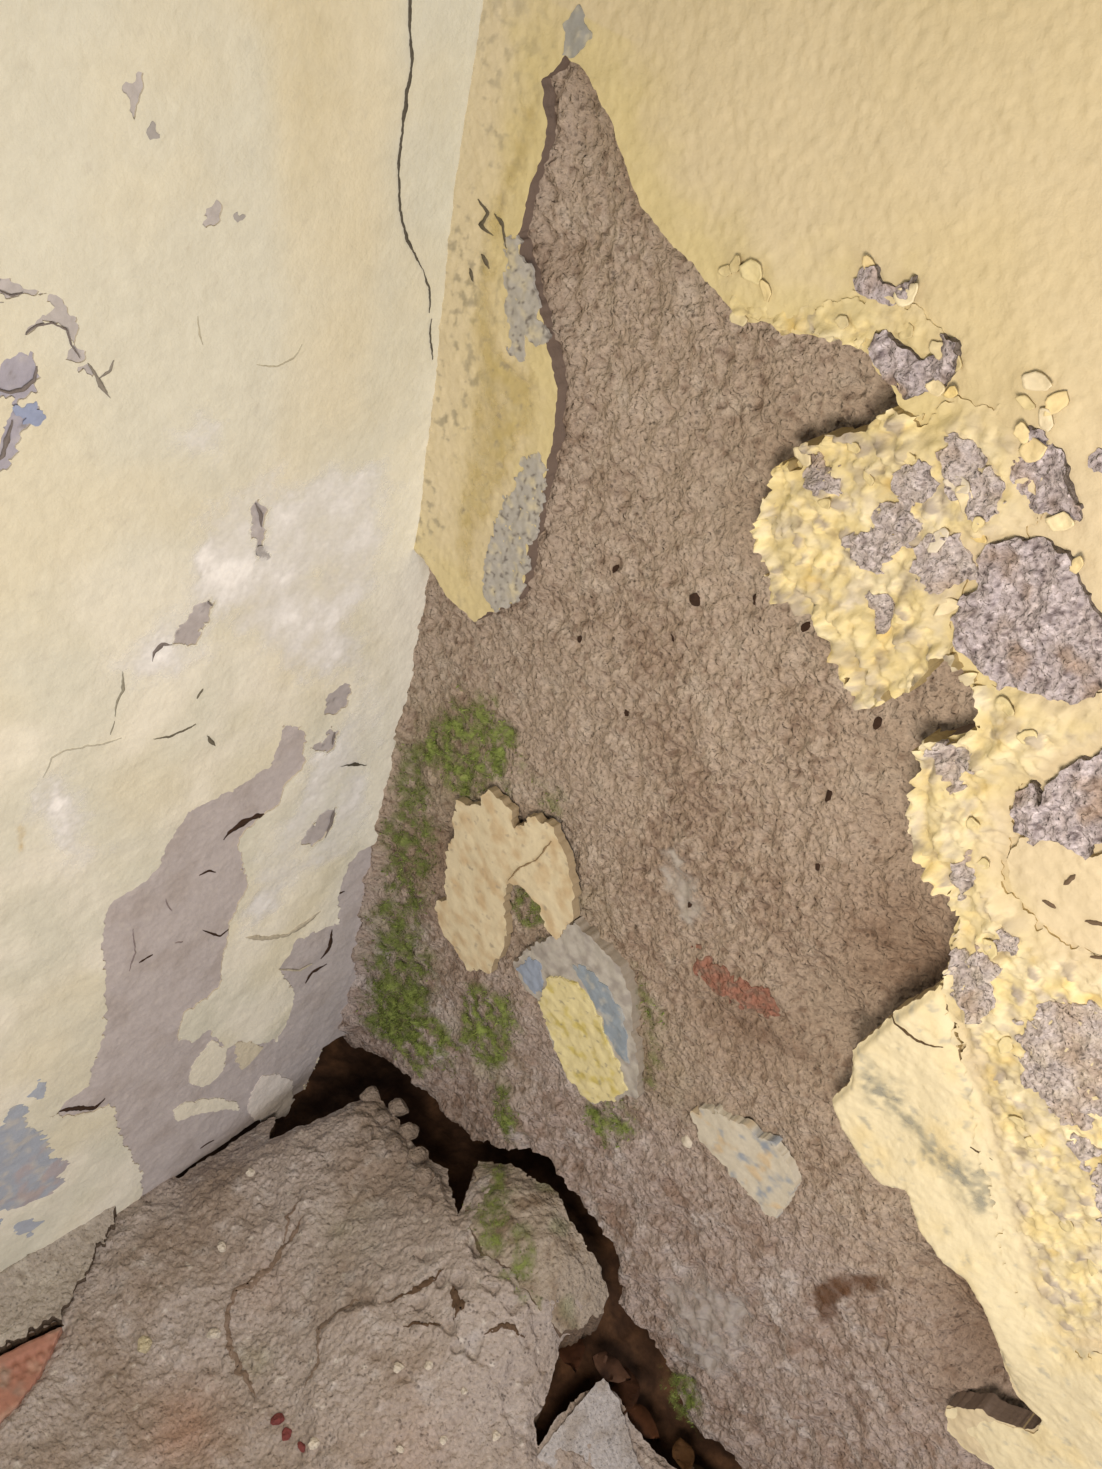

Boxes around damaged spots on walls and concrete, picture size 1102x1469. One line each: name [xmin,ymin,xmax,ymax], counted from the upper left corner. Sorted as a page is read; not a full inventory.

peeling [562,5,593,58]
peeling [122,72,160,140]
peeling [202,200,246,227]
crack [397,0,433,360]
peeling [0,278,93,470]
peeling [250,501,270,560]
peeling [152,599,213,662]
peeling [324,683,351,714]
flaking render [338,62,1102,1469]
peeling [58,725,372,1196]
crack [175,1036,742,1469]